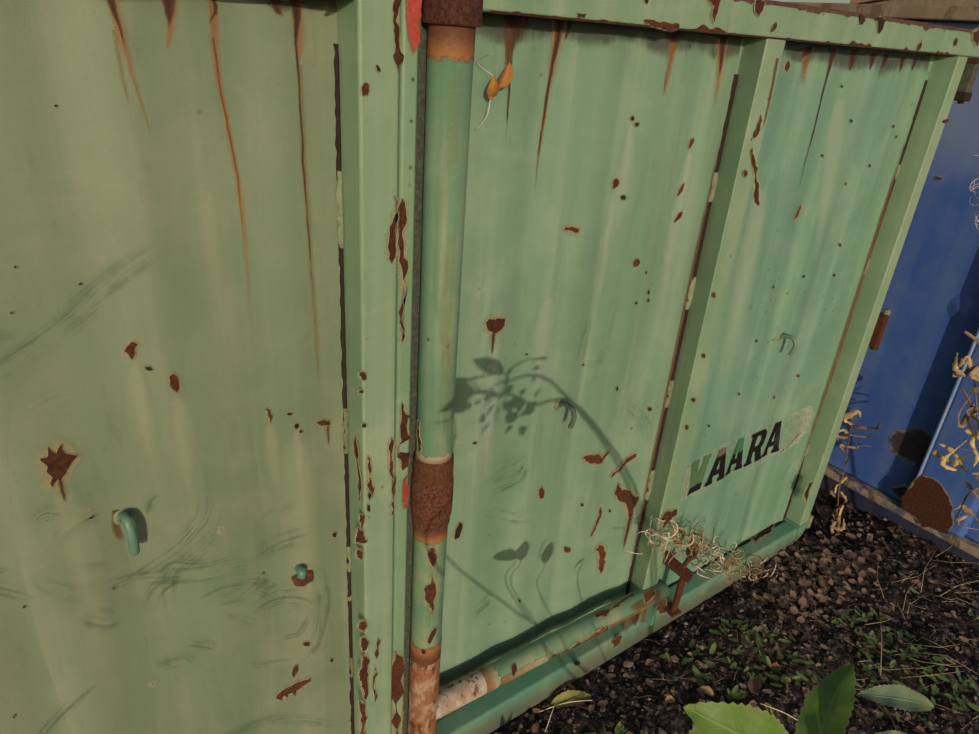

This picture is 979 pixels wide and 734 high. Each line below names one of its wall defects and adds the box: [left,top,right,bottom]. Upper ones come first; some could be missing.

corrosion [208,0,246,256]
corrosion [427,23,476,63]
corrosion [490,0,979,178]
corrosion [387,190,409,348]
corrosion [610,178,713,546]
corrosion [807,174,896,447]
corrosion [38,444,78,500]
corrosion [388,403,452,515]
corrosion [889,429,953,534]
corrosion [358,620,370,734]
corrosion [391,634,442,734]
corrosion [553,588,667,657]